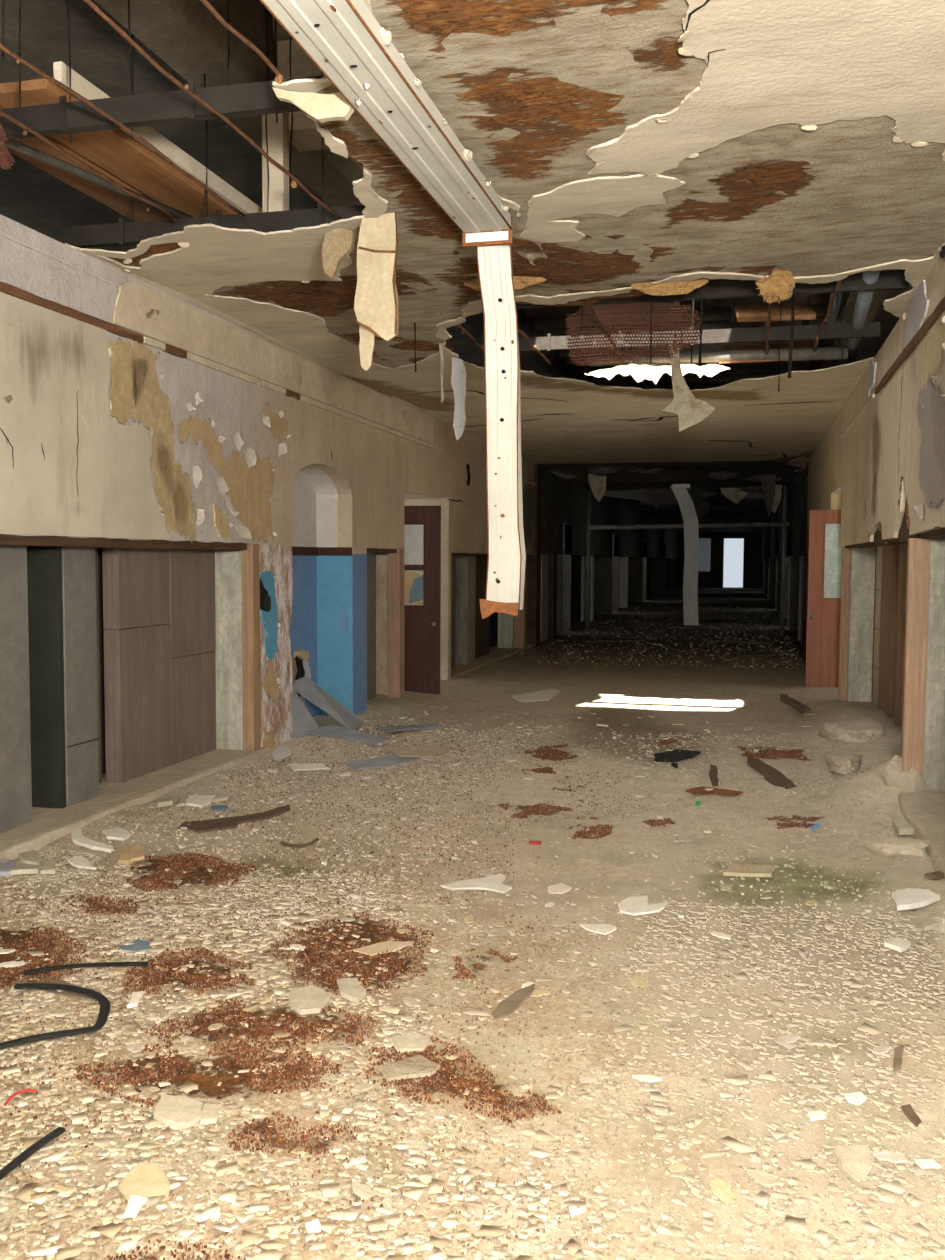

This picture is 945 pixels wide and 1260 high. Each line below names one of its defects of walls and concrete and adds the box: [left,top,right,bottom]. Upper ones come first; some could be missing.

flaking render [204,226,360,345]
flaking render [315,75,340,94]
flaking render [313,110,481,370]
flaking render [370,0,945,296]
flaking render [585,361,730,384]
peeling [867,280,945,545]